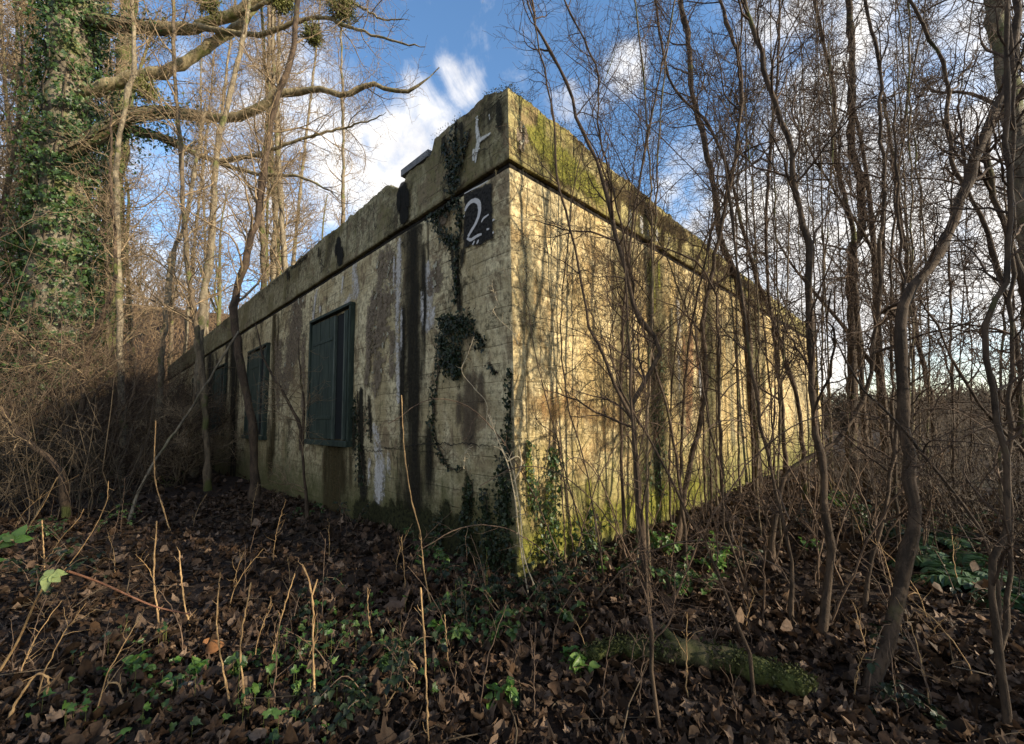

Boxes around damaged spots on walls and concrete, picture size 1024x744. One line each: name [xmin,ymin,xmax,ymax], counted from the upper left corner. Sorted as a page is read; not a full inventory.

water stain [335,237,359,303]
water stain [393,181,435,517]
water stain [322,387,390,514]